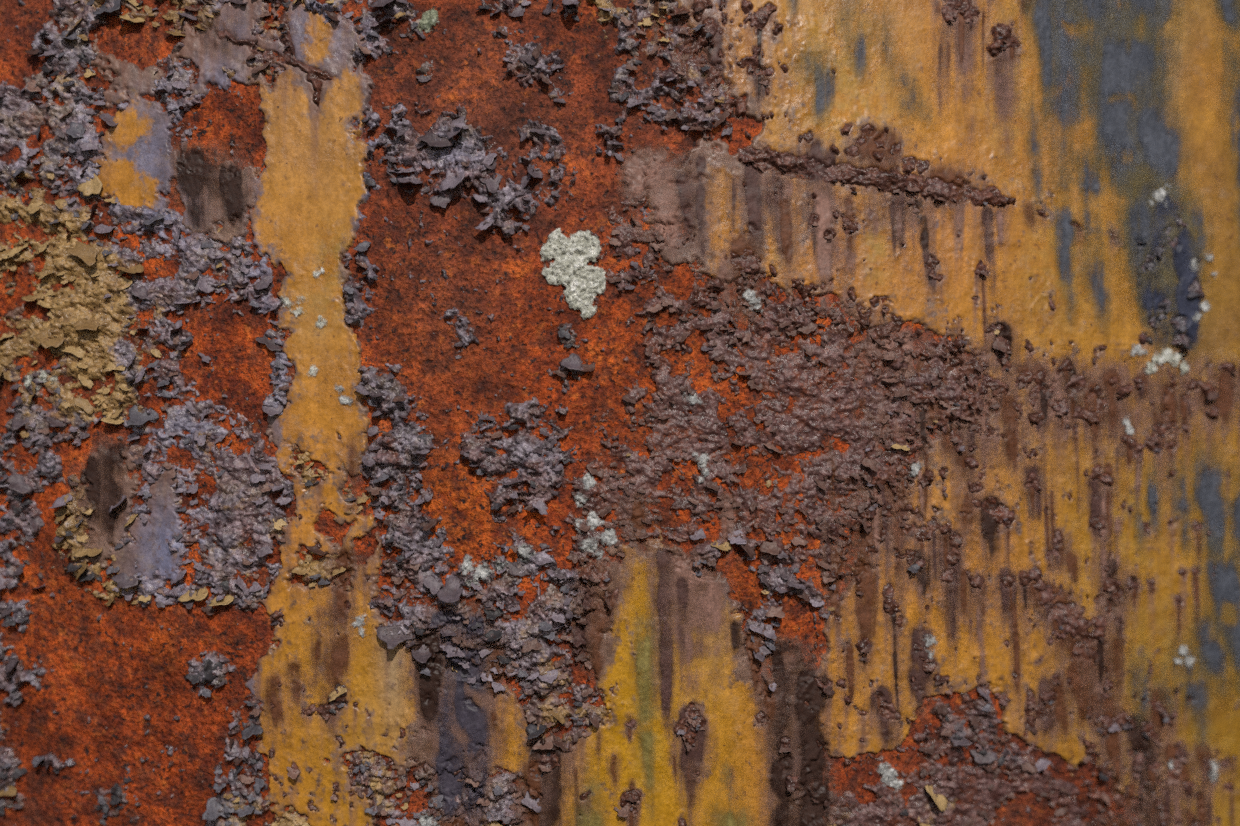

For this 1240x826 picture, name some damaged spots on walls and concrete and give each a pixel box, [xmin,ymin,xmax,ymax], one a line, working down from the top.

corrosion [654,0,790,135]
corrosion [176,146,247,230]
corrosion [716,153,963,313]
peeling [0,0,312,826]
peeling [216,0,1000,760]
water stain [1136,478,1158,538]
corrosion [265,536,372,727]
peeling [325,725,541,826]
water stain [414,608,500,826]
water stain [636,636,653,787]
peeling [811,657,1150,826]
water stain [1175,458,1240,736]